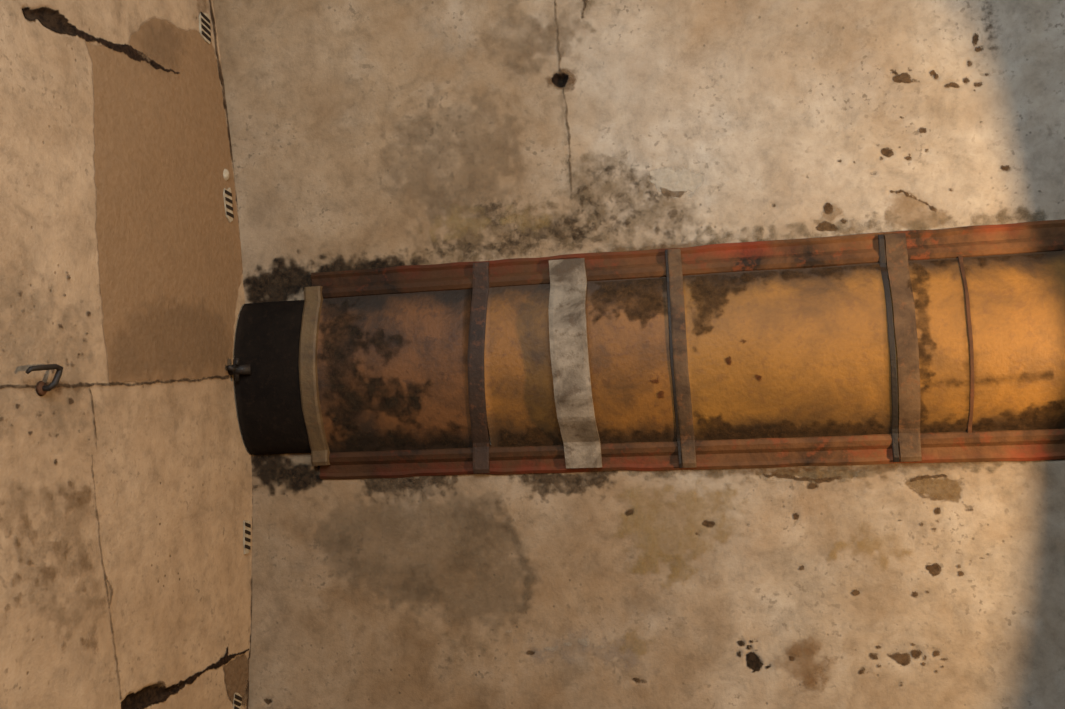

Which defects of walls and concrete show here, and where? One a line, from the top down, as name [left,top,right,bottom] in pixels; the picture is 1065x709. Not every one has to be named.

crack [22,7,179,74]
crack [554,3,571,183]
leakage [85,17,419,383]
leakage [499,202,677,254]
crack [120,582,252,709]